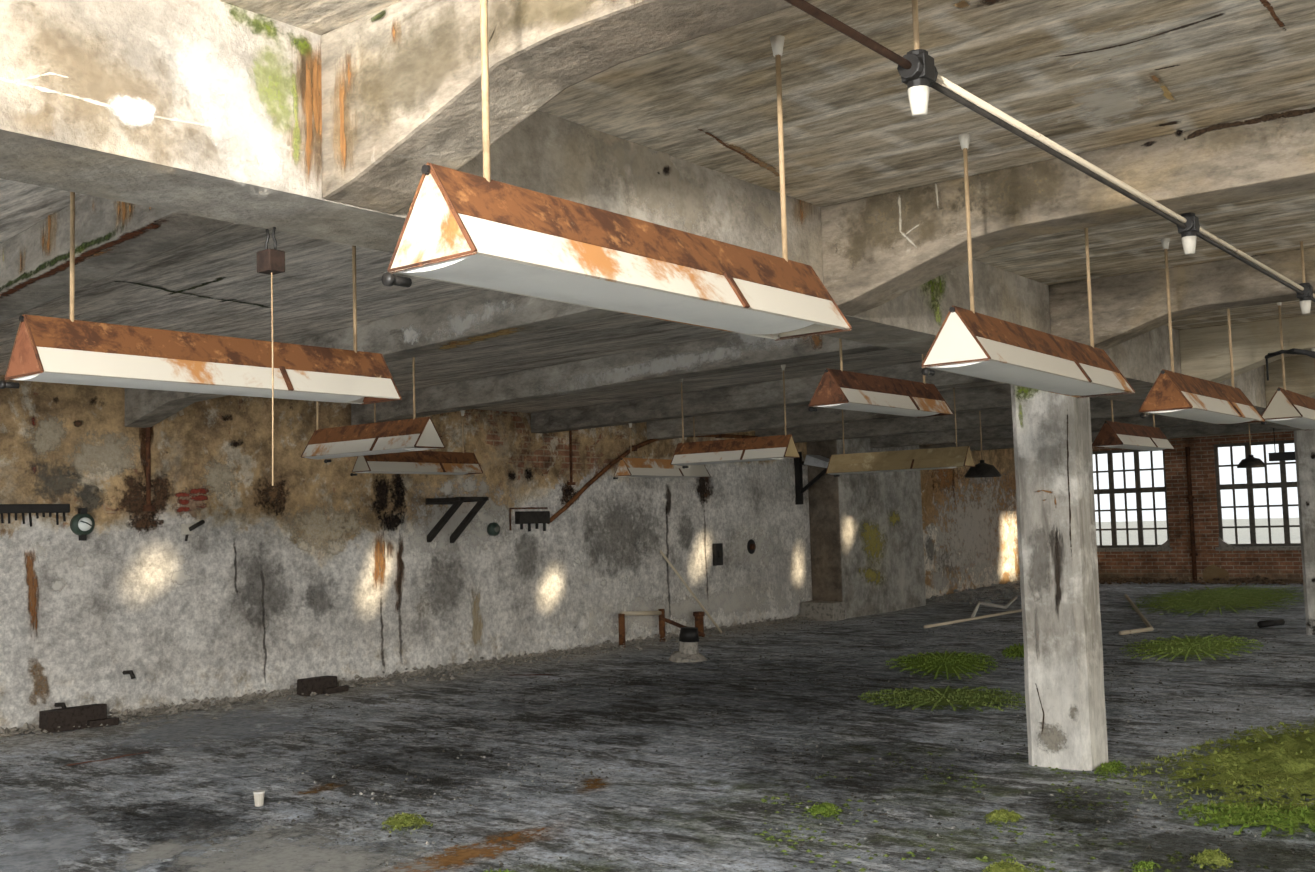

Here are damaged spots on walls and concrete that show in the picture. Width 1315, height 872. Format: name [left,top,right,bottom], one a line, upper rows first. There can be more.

crack [1056,13,1225,60]
crack [1260,0,1286,30]
corrosion [303,55,322,177]
corrosion [339,58,351,170]
peeling [26,397,140,474]
peeling [172,440,243,518]
peeling [401,469,533,553]
corrosion [373,533,404,610]
damp [1029,529,1061,613]